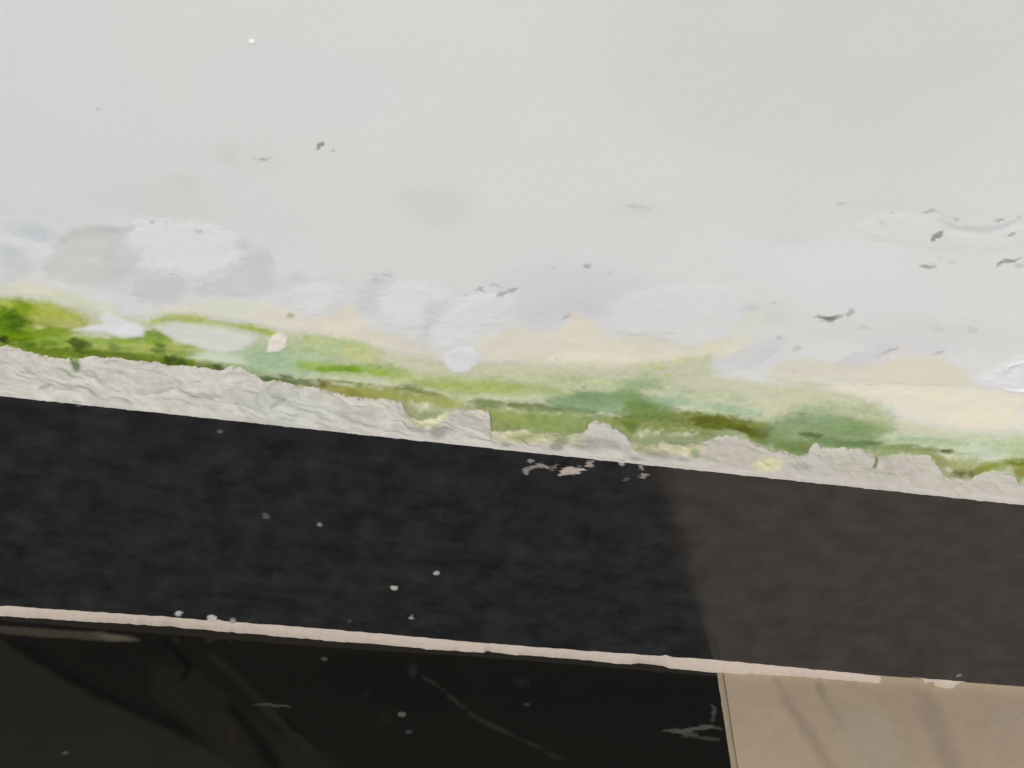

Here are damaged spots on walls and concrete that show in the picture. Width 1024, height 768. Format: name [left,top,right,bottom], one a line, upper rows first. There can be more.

damp [0,217,314,337]
damp [1,333,159,363]
damp [168,343,198,368]
peeling [441,345,484,375]
damp [261,332,614,420]
damp [648,386,768,416]
spalling [388,421,457,441]
spalling [546,433,690,463]
damp [633,428,970,457]
damp [971,460,1024,484]